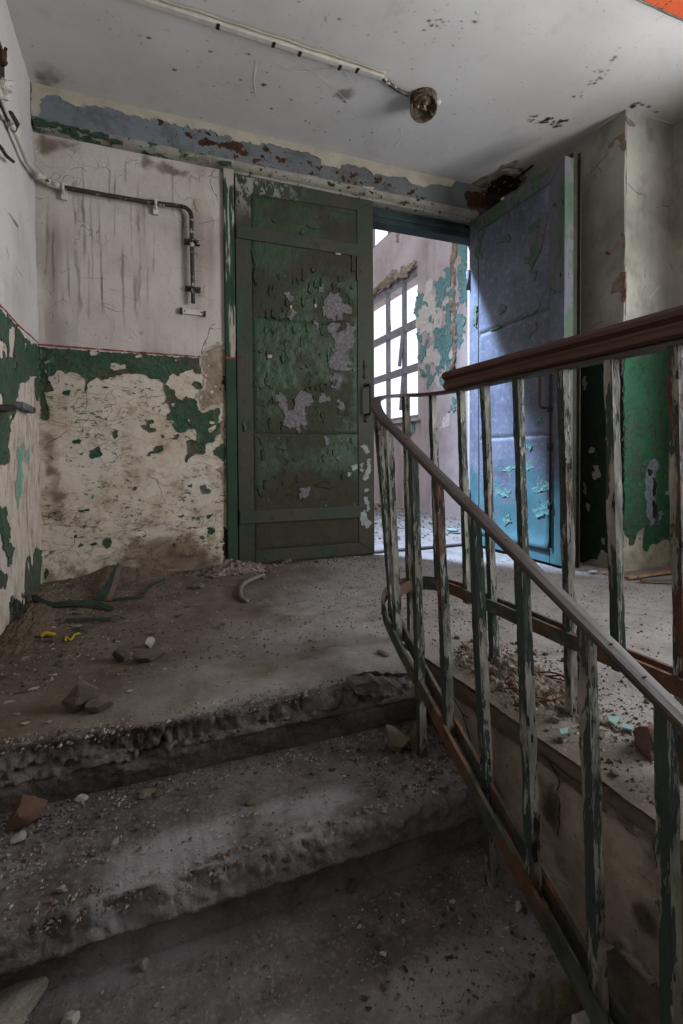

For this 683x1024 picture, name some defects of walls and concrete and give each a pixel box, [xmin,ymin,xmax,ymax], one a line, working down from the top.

corrosion [185,131,291,177]
peeling [30,82,456,189]
corrosion [307,160,392,199]
spalling [472,160,534,199]
peeling [0,309,226,494]
peeling [275,284,357,433]
peeling [413,216,486,429]
peeling [620,350,670,552]
peeling [0,506,49,623]
spalling [0,619,409,757]
crack [454,699,471,742]
crack [537,752,582,835]